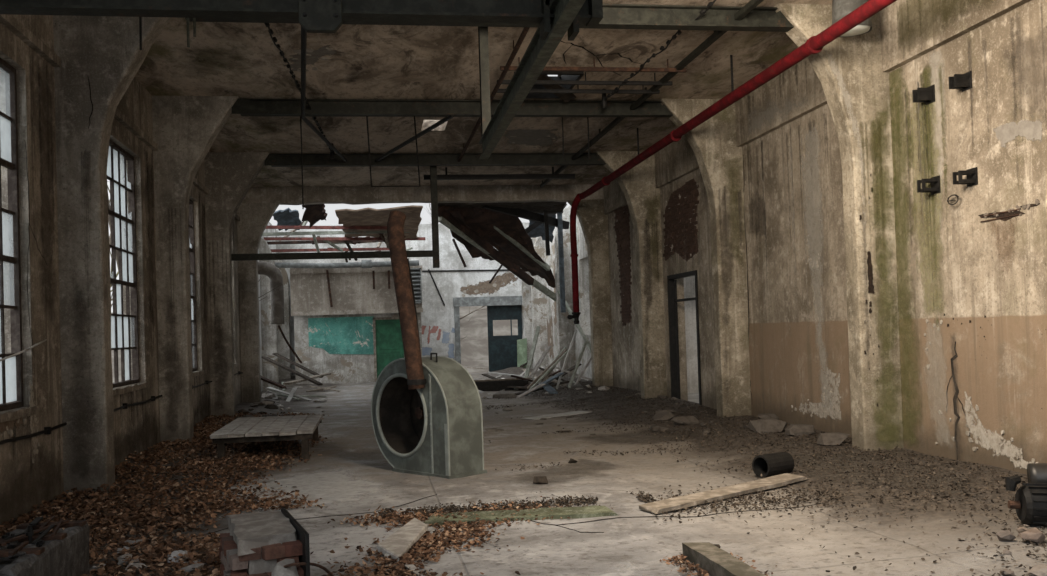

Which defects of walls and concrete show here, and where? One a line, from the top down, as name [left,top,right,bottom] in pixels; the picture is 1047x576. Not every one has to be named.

flaking render [613,205,632,327]
flaking render [663,179,699,261]
damp [890,67,947,326]
peeling [791,367,841,420]
crack [946,341,970,460]
peeling [951,391,1038,469]